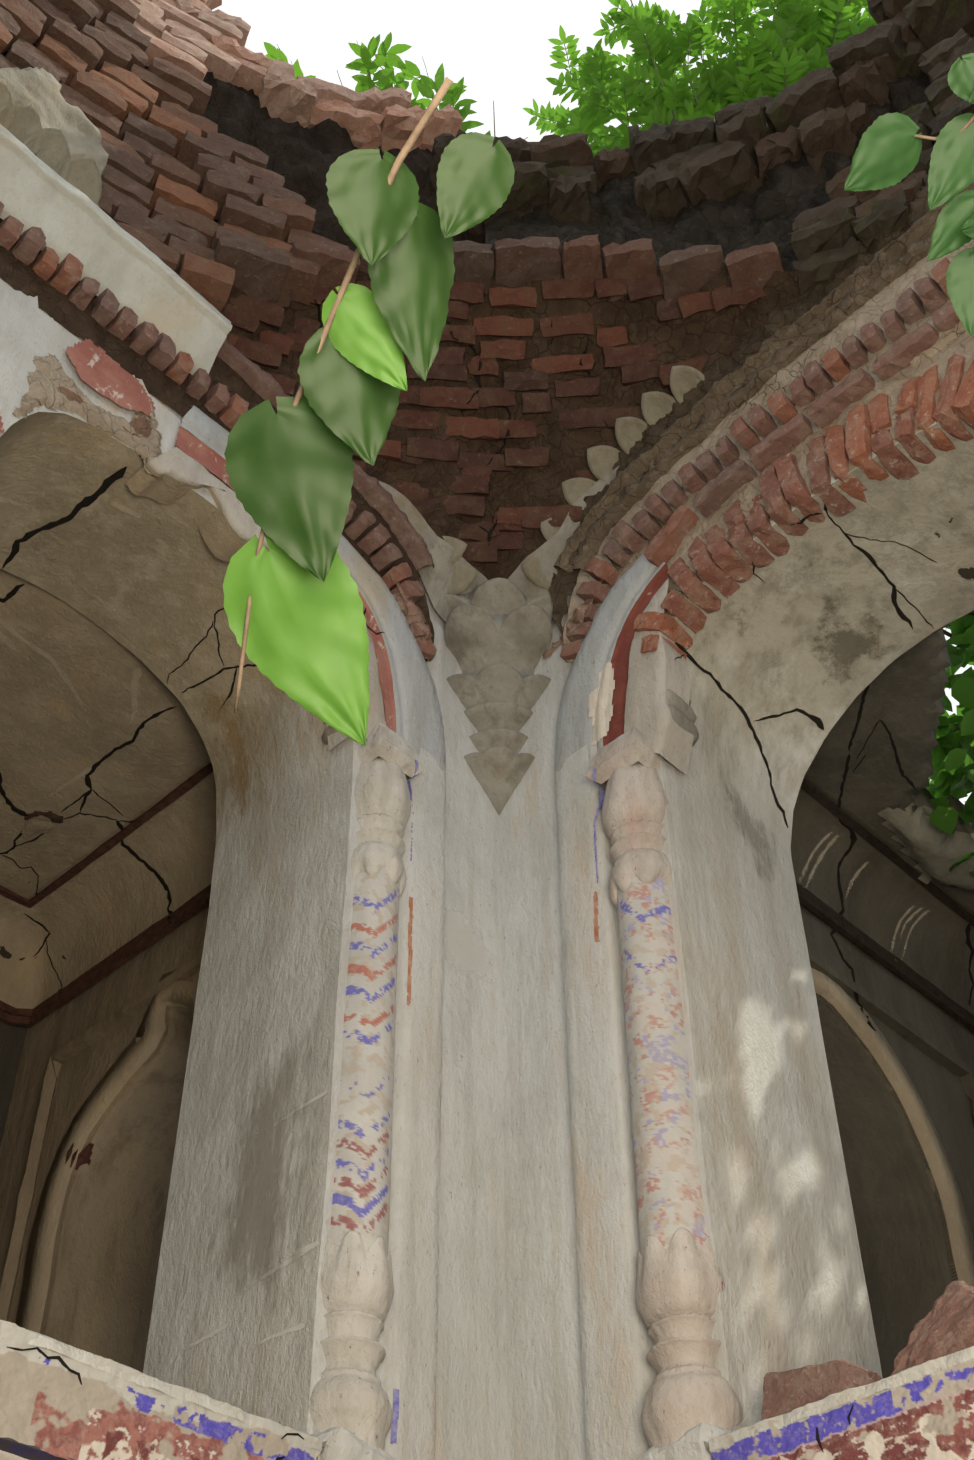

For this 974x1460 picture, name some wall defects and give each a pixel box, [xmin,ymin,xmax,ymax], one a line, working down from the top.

spalling [0,339,162,479]
crack [0,467,127,603]
crack [791,504,937,629]
crack [0,607,257,993]
crack [675,642,916,1031]
crack [7,1347,82,1385]